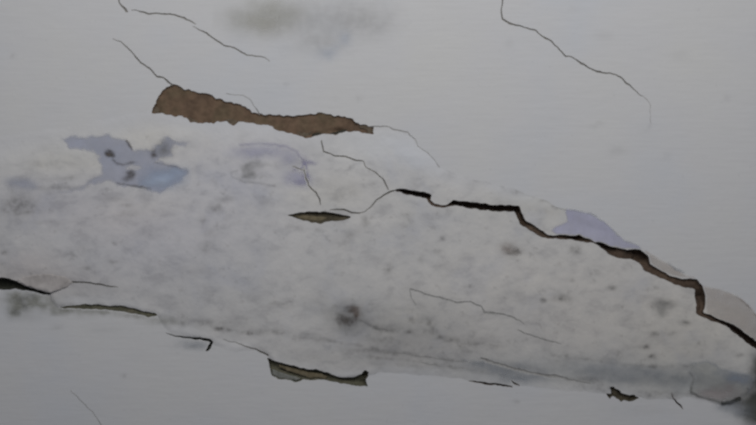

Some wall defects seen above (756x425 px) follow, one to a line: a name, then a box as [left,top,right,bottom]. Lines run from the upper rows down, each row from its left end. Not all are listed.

crack [118,0,270,62]
crack [114,39,173,86]
crack [501,0,651,122]
spalling [152,84,374,138]
peeling [65,136,187,192]
crack [371,126,440,168]
spalling [288,211,351,224]
crack [293,140,756,349]
peeling [553,210,639,248]
crack [0,274,157,317]
spalling [223,339,369,387]
spalling [607,387,638,402]